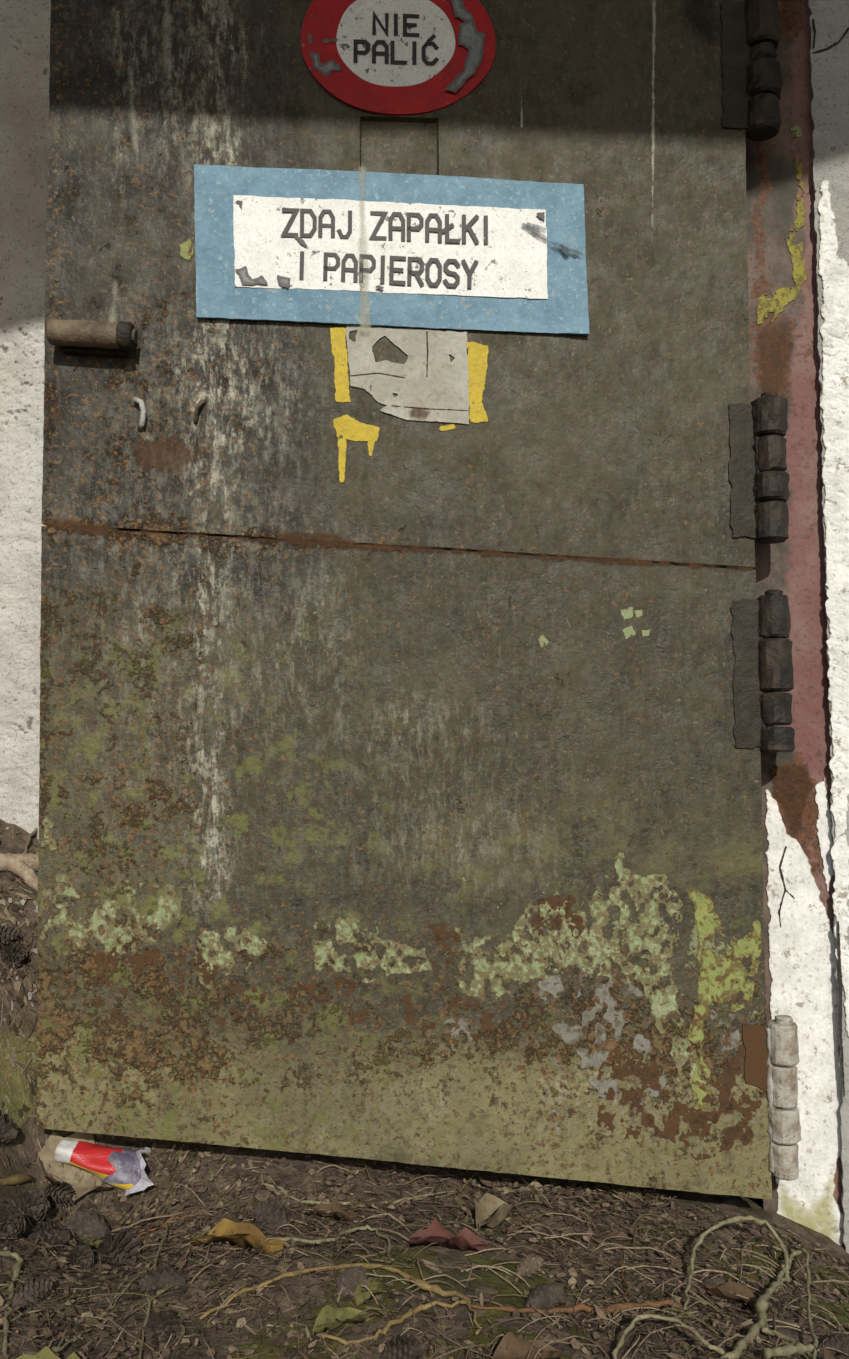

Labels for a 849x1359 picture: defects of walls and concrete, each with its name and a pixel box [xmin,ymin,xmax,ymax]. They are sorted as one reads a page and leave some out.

crack [812,19,849,53]
peeling [235,266,291,288]
rust [45,519,115,535]
rust [238,532,670,566]
peeling [458,157,849,1246]
rust [769,765,811,831]
rust [90,946,266,1025]
peeling [312,913,432,983]
rust [428,922,494,1040]
rust [531,894,585,938]
peeling [443,1017,473,1051]
rust [597,1042,762,1161]